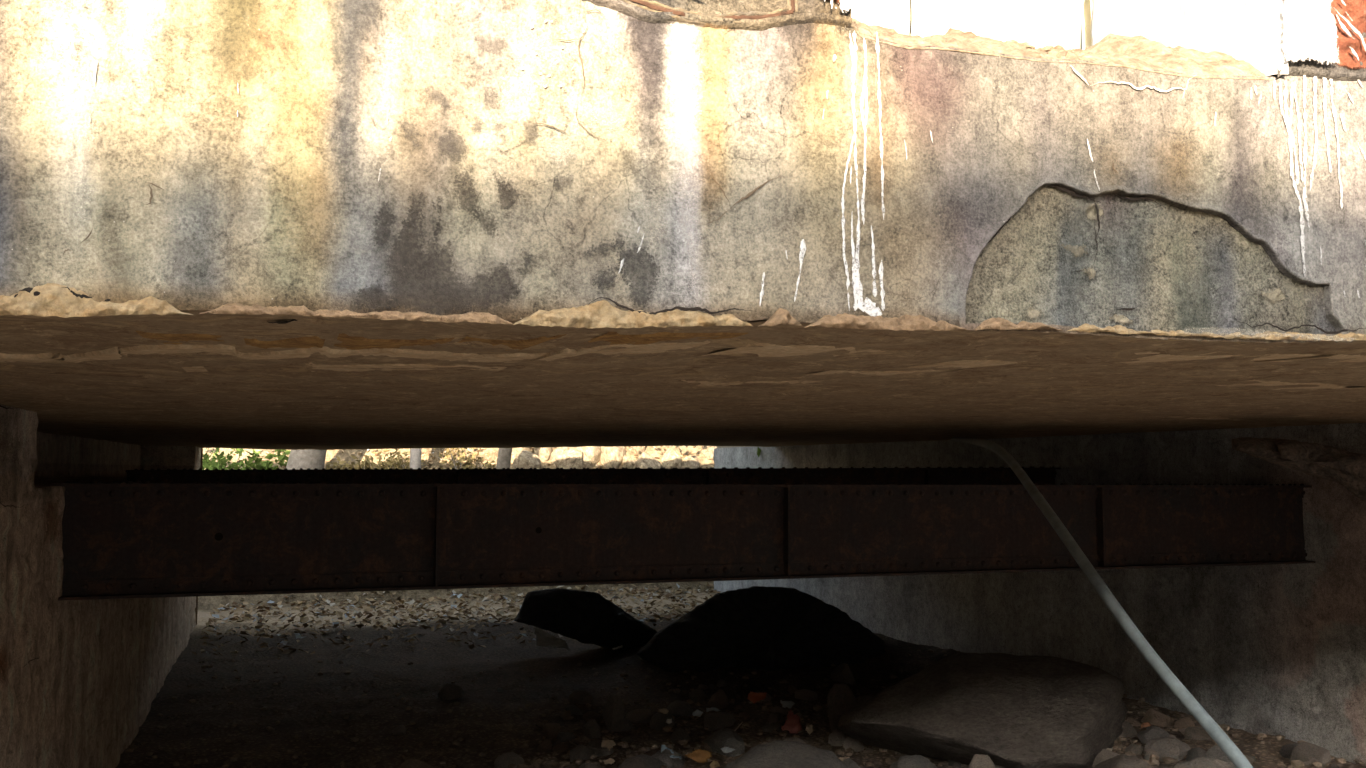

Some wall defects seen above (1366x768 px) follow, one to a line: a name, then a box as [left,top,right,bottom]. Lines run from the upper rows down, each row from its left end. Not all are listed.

damp [352,87,532,315]
spalling [0,178,1366,386]
damp [847,14,885,317]
crack [1070,65,1194,97]
peeling [1216,379,1366,390]
damp [1279,75,1343,277]